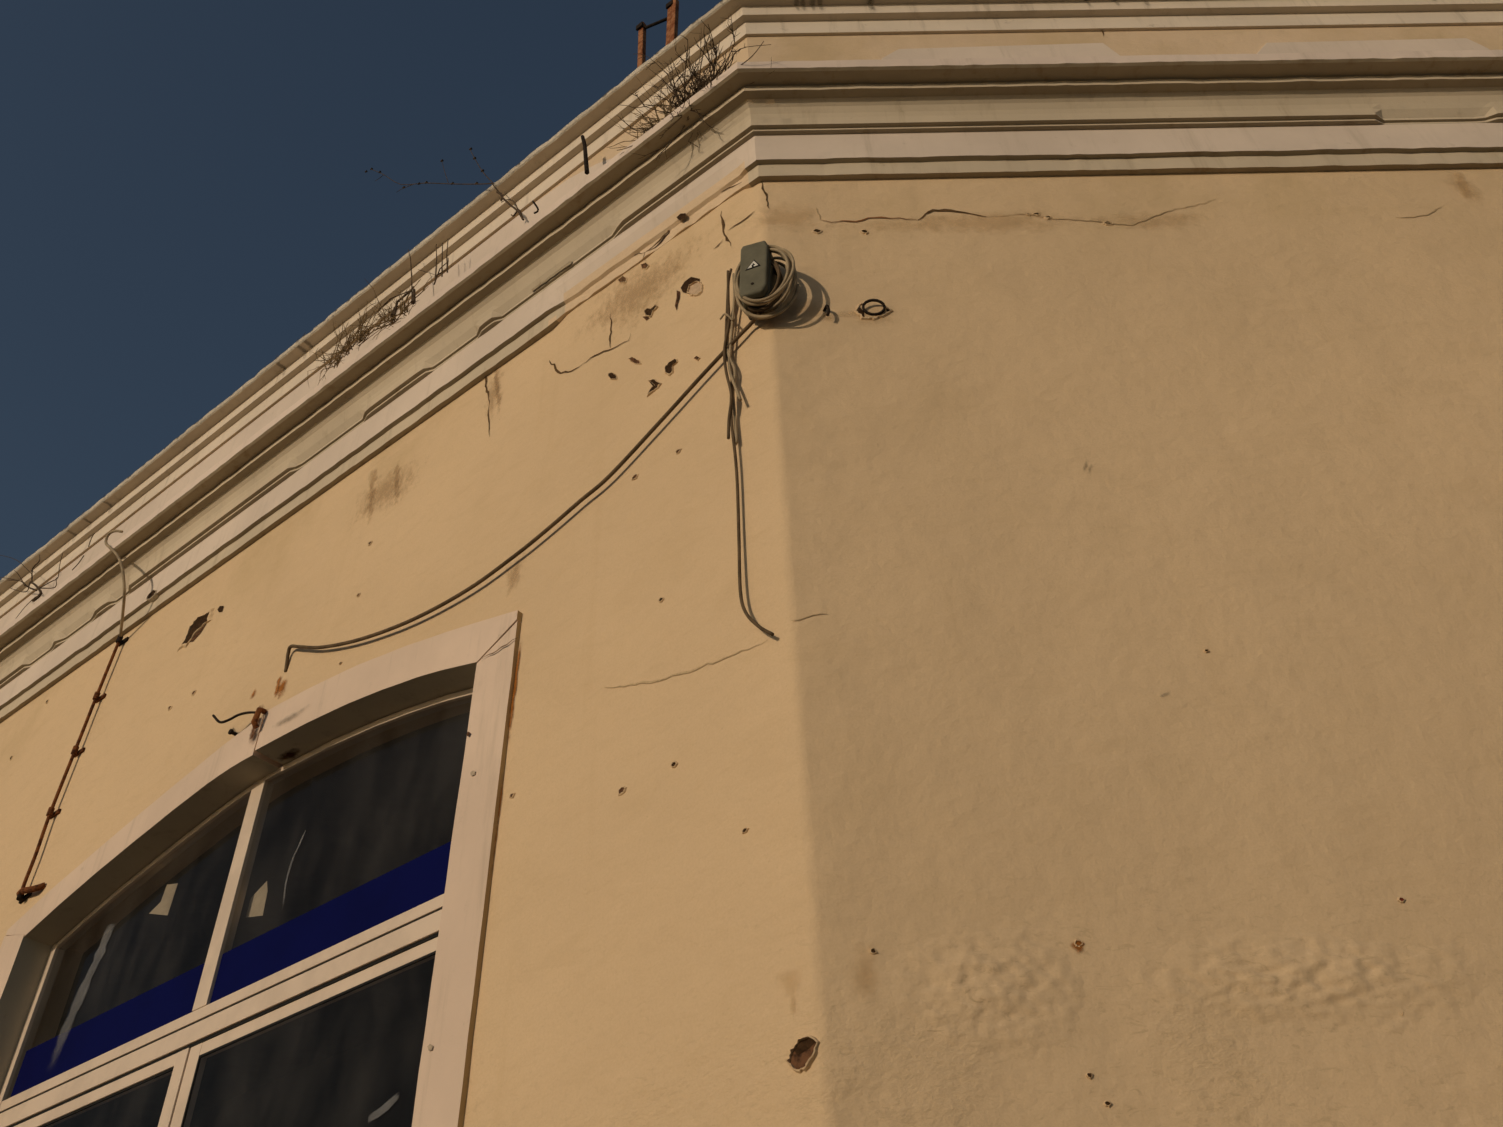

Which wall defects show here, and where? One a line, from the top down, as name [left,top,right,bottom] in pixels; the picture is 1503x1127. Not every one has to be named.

crack [816,199,1215,225]
spalling [643,277,704,320]
crack [549,314,630,374]
spalling [628,356,701,397]
spalling [177,606,223,652]
crack [607,613,825,688]
corrosion [249,677,285,740]
spalling [786,1035,820,1074]